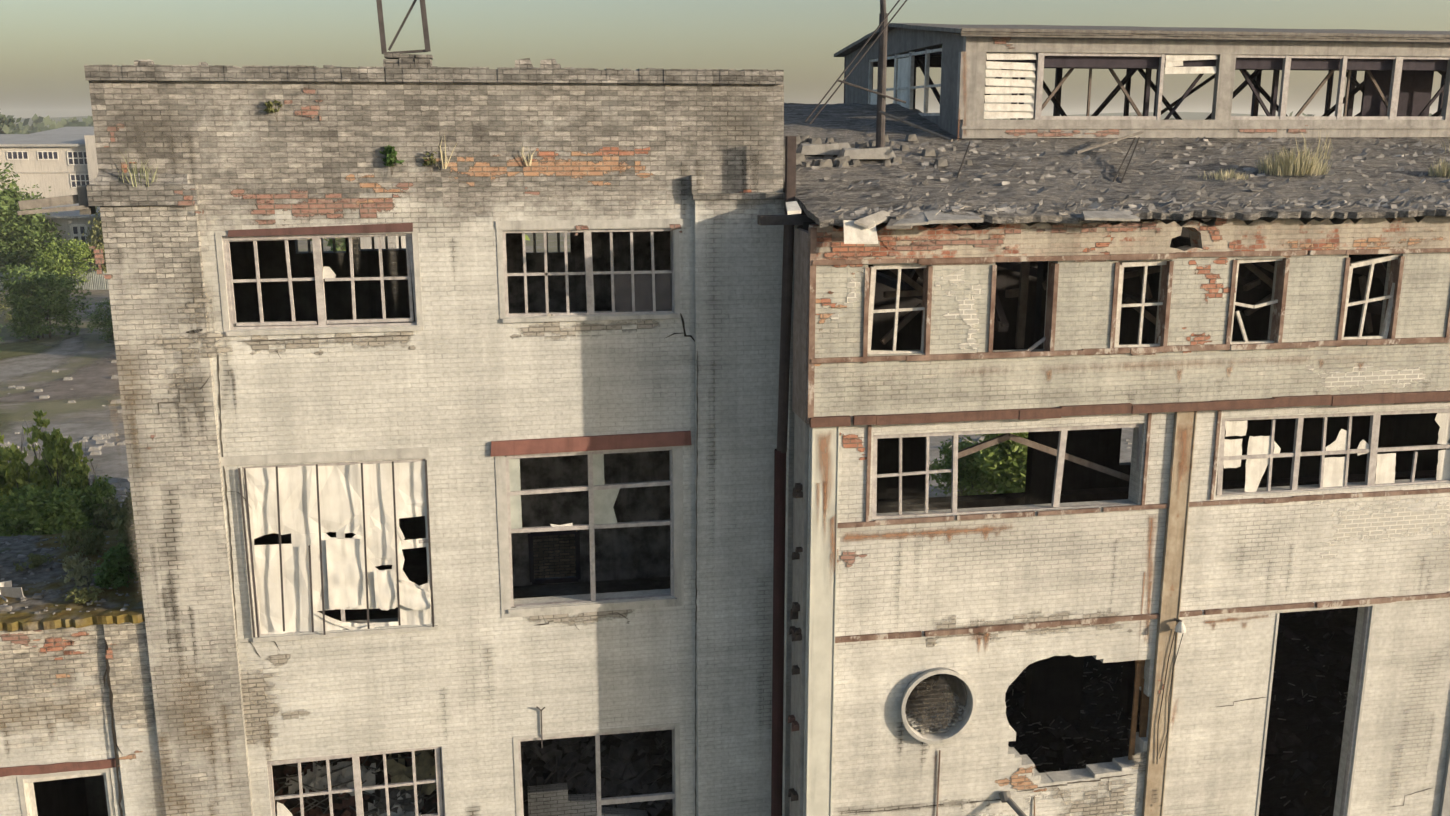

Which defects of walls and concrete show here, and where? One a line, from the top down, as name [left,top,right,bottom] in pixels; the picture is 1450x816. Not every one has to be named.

leakage [115,104,194,174]
spalling [424,147,653,195]
spalling [1189,218,1238,302]
rust [817,435,1006,560]
leakage [133,490,197,656]
crack [664,313,698,816]
rust [1141,518,1153,614]
spalling [0,630,89,684]
crack [537,609,631,630]
crack [103,640,123,816]
leakage [172,673,228,763]
peeling [942,752,1147,816]